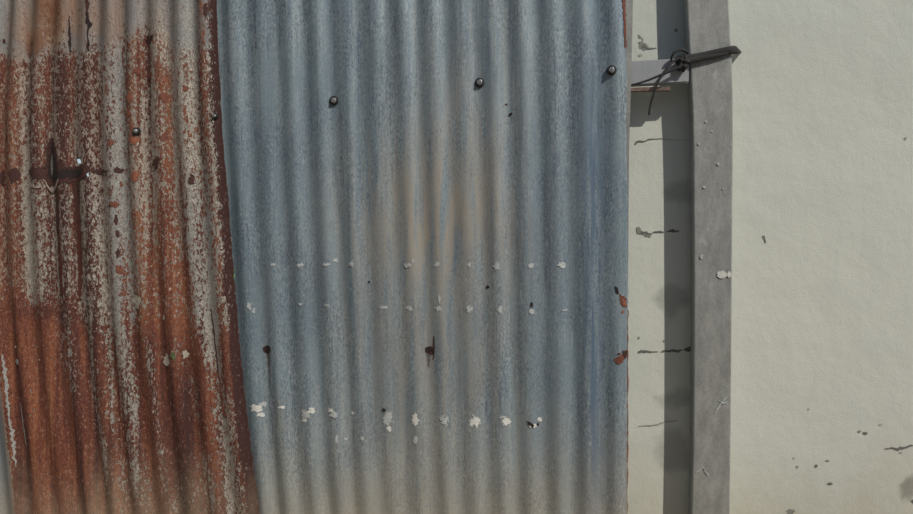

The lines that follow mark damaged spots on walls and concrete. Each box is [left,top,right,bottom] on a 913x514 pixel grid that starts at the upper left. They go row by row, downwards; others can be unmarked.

corrosion [54,183,63,297]
corrosion [72,182,82,301]
corrosion [109,201,120,238]
crack [636,227,679,237]
crack [638,337,691,354]
crack [885,445,913,454]